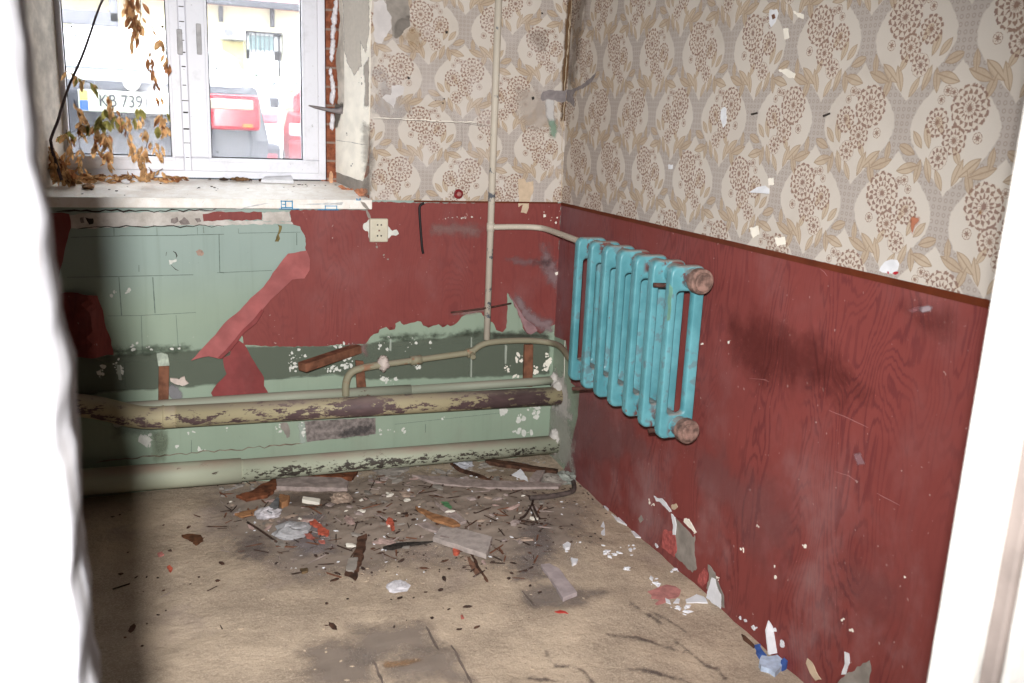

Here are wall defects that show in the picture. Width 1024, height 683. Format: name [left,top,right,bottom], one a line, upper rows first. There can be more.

flaking render [343,0,369,85]
flaking render [70,211,293,229]
flaking render [360,201,399,260]
peeling [327,342,353,373]
peeling [504,352,552,378]
peeling [138,433,152,447]
spalling [275,418,406,443]
peeling [499,406,541,437]
peeling [671,504,697,534]